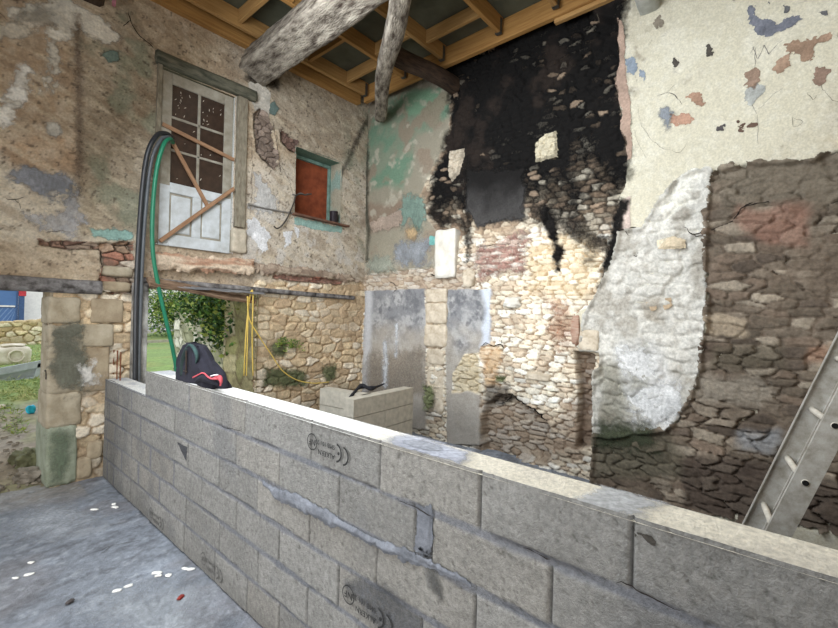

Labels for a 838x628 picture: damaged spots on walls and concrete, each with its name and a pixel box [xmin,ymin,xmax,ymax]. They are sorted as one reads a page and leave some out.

peeling [747,5,803,37]
peeling [772,32,832,86]
peeling [744,67,766,106]
spalling [253,109,299,169]
peeling [246,172,284,252]
peeling [283,227,300,247]
spalling [473,229,529,281]
crack [685,201,769,237]
damp [79,361,96,384]
damp [366,342,424,393]
spalling [579,151,838,536]
crack [617,581,680,611]